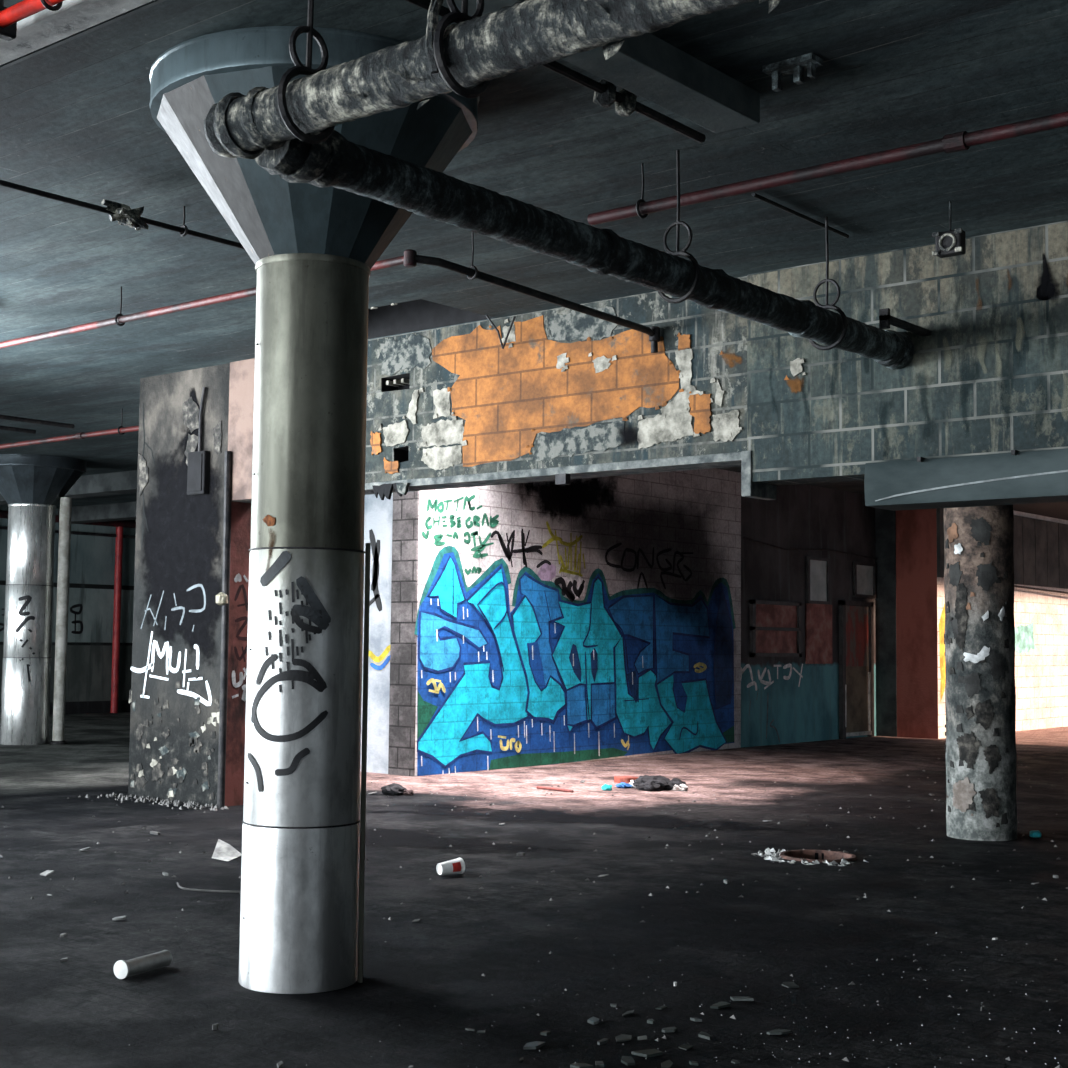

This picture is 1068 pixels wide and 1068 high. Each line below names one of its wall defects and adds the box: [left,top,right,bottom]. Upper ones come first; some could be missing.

peeling [370,306,743,500]
spalling [784,358,807,393]
peeling [944,516,1009,827]